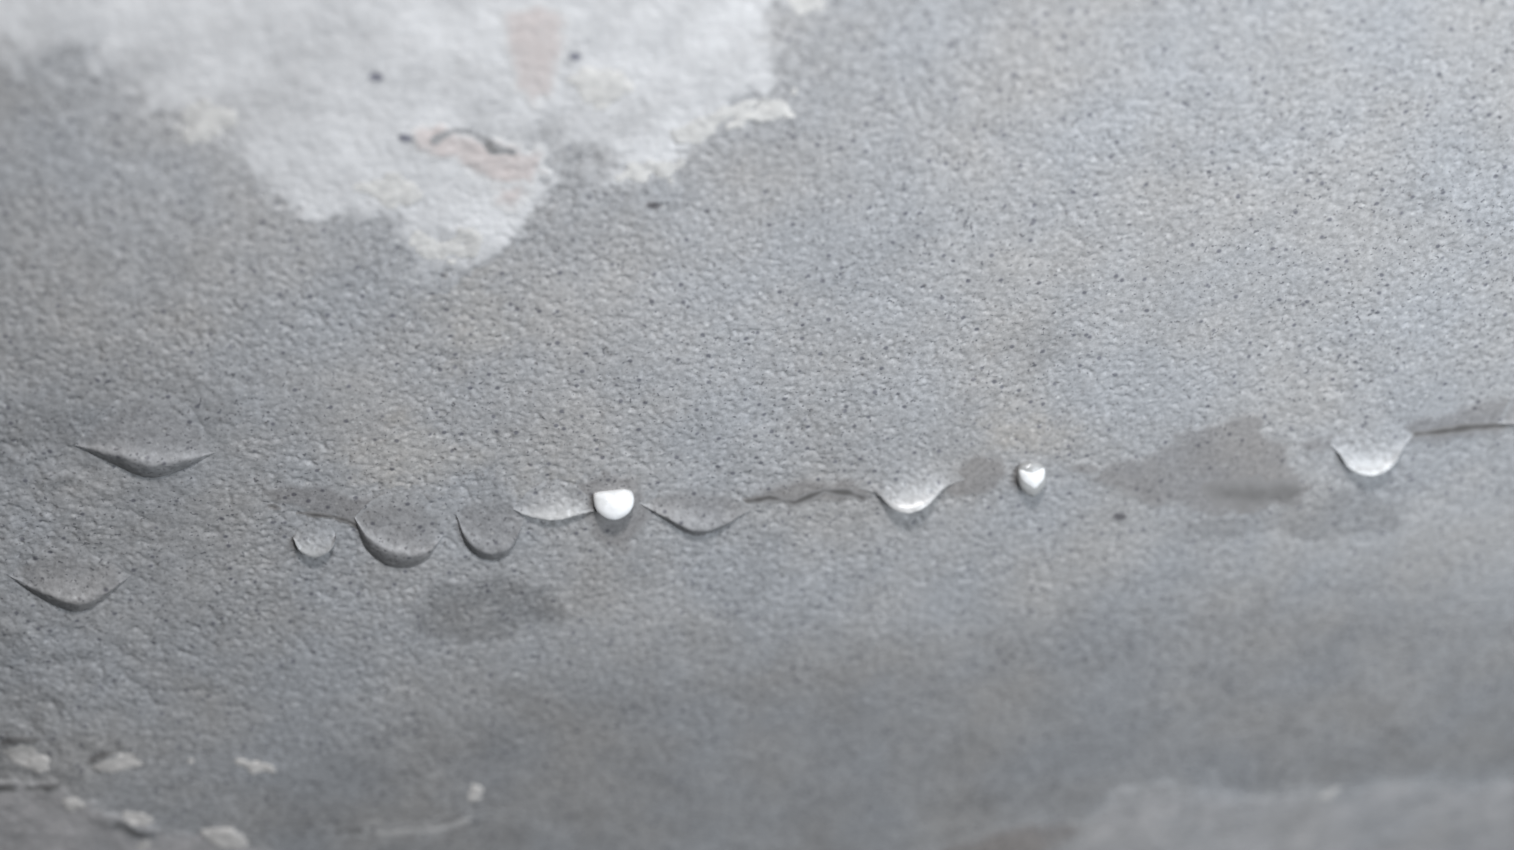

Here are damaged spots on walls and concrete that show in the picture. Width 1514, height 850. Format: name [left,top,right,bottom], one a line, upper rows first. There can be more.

flaking render [0,0,837,295]
water stain [370,229,555,391]
water stain [950,309,1096,467]
water stain [203,402,1514,850]